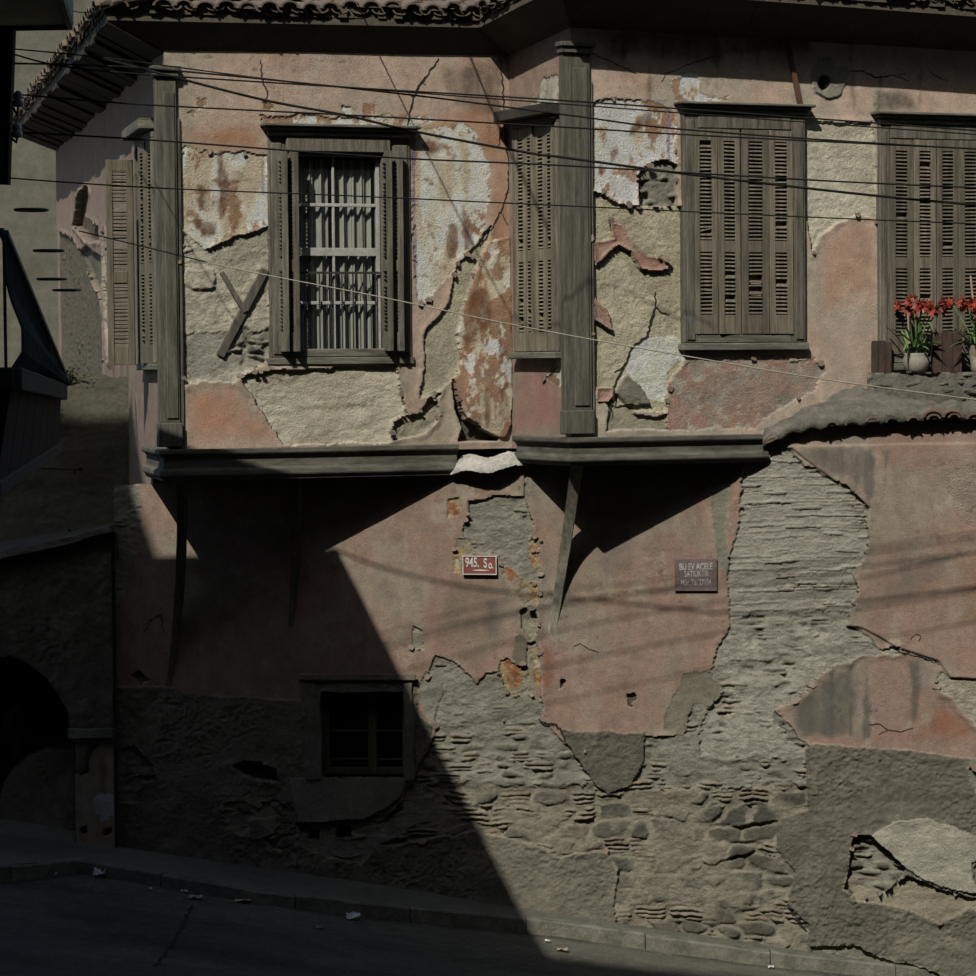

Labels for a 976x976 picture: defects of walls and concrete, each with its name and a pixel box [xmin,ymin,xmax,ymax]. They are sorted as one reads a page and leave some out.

spalling [57,185,108,375]
spalling [177,101,501,445]
spalling [591,71,826,431]
crack [609,292,669,415]
peeling [943,463,976,527]
spalling [380,440,940,976]
spalling [933,672,976,724]
spalling [236,760,279,784]
spalling [845,832,976,925]